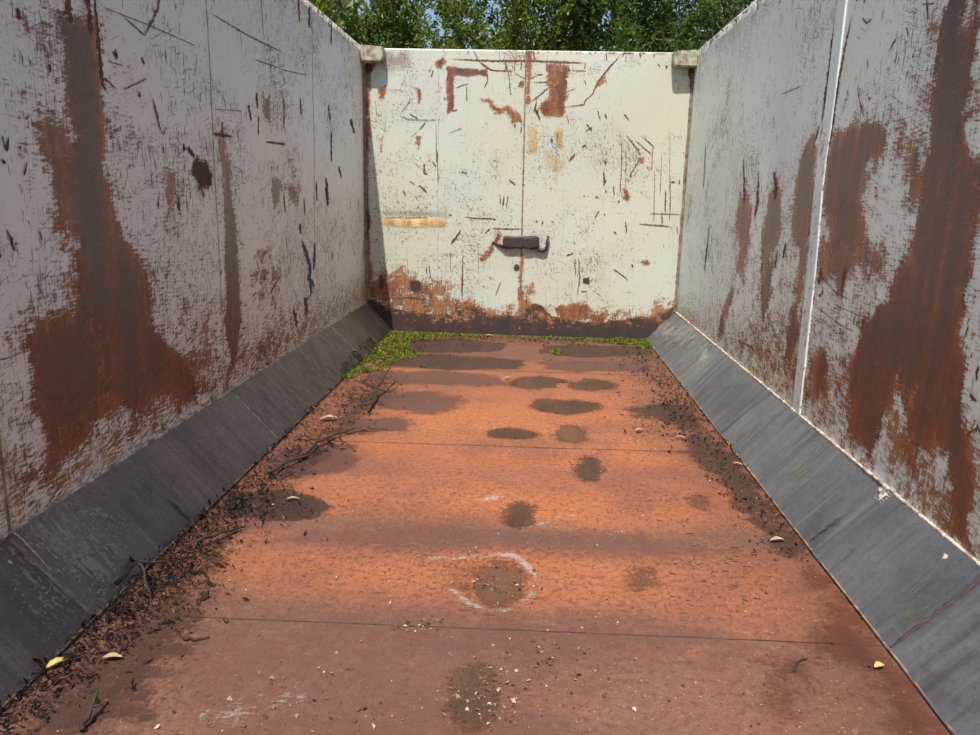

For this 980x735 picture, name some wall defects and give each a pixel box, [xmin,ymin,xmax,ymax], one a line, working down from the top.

rust [0,0,980,573]